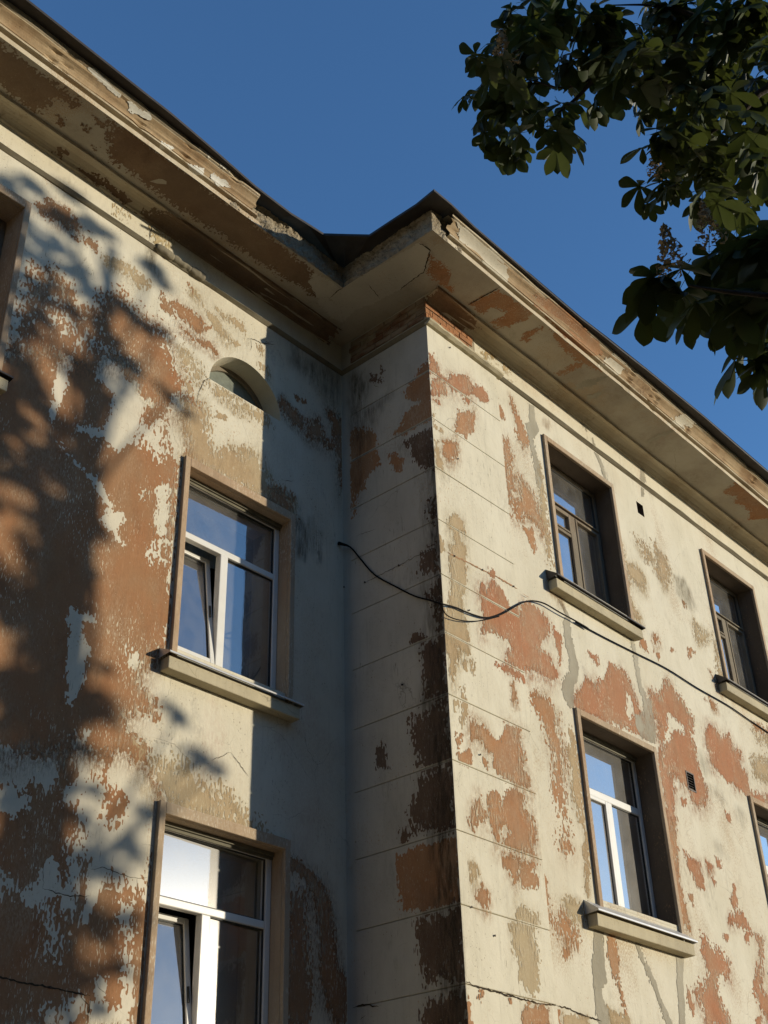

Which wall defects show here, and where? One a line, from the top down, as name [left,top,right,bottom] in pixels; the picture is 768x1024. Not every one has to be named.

peeling [0,41,343,345]
crack [370,243,431,296]
peeling [667,412,696,430]
peeling [723,482,768,520]
peeling [0,196,557,1024]
peeling [622,531,675,625]
peeling [640,600,725,712]
peeling [395,496,591,1024]
peeling [574,651,768,1024]